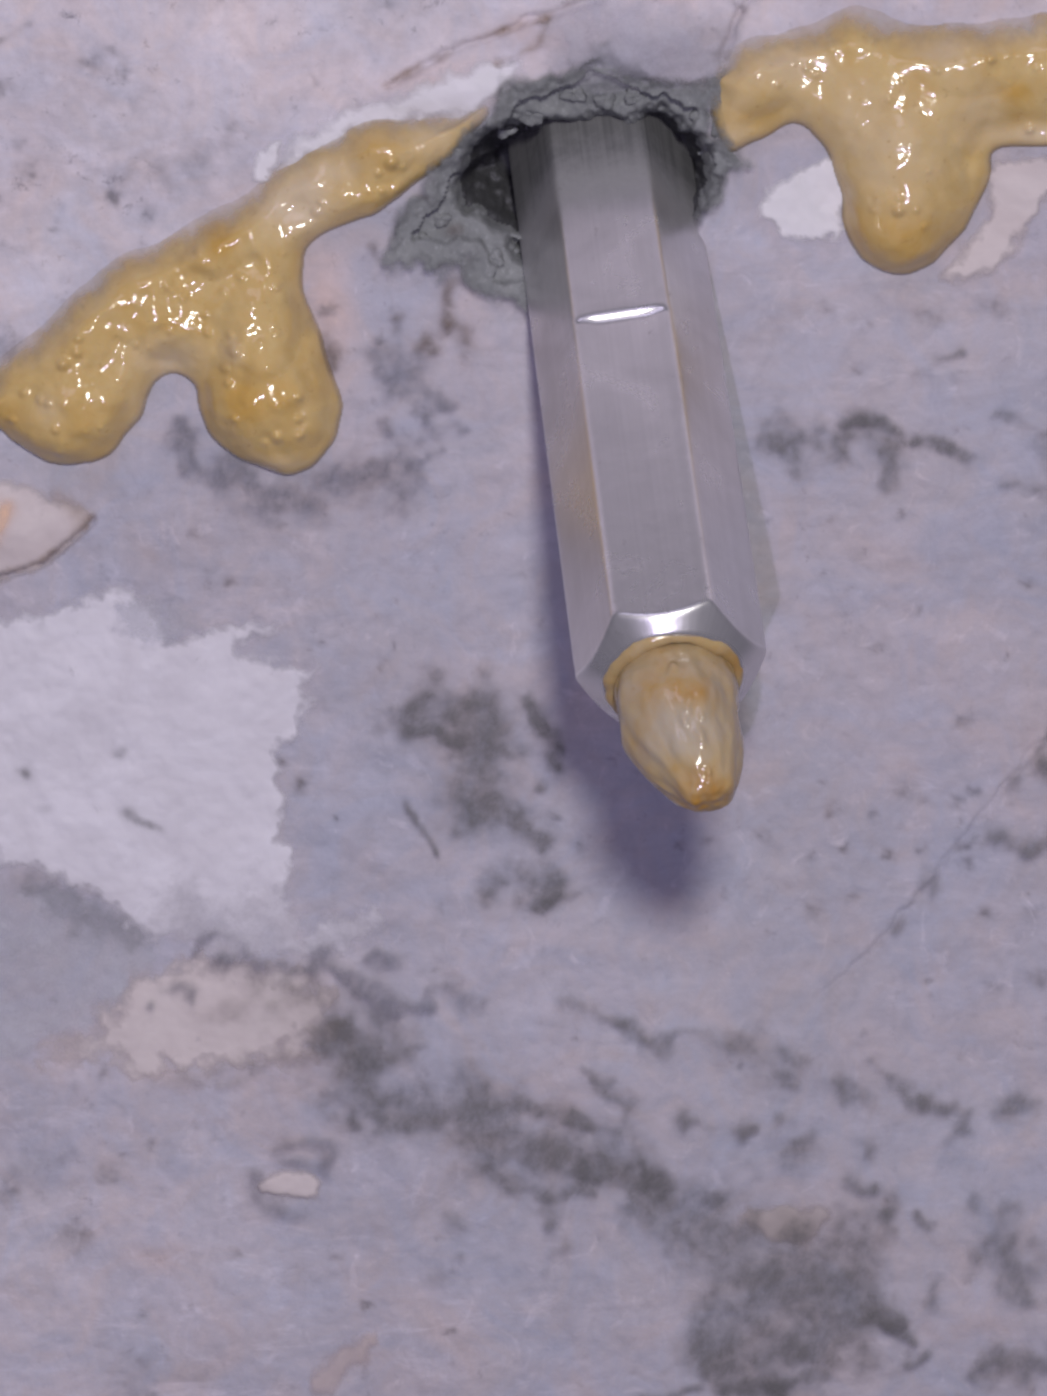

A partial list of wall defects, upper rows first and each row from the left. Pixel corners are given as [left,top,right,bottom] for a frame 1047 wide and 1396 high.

spalling [254,44,750,312]
peeling [760,159,844,239]
peeling [942,158,1047,281]
peeling [0,587,382,1080]